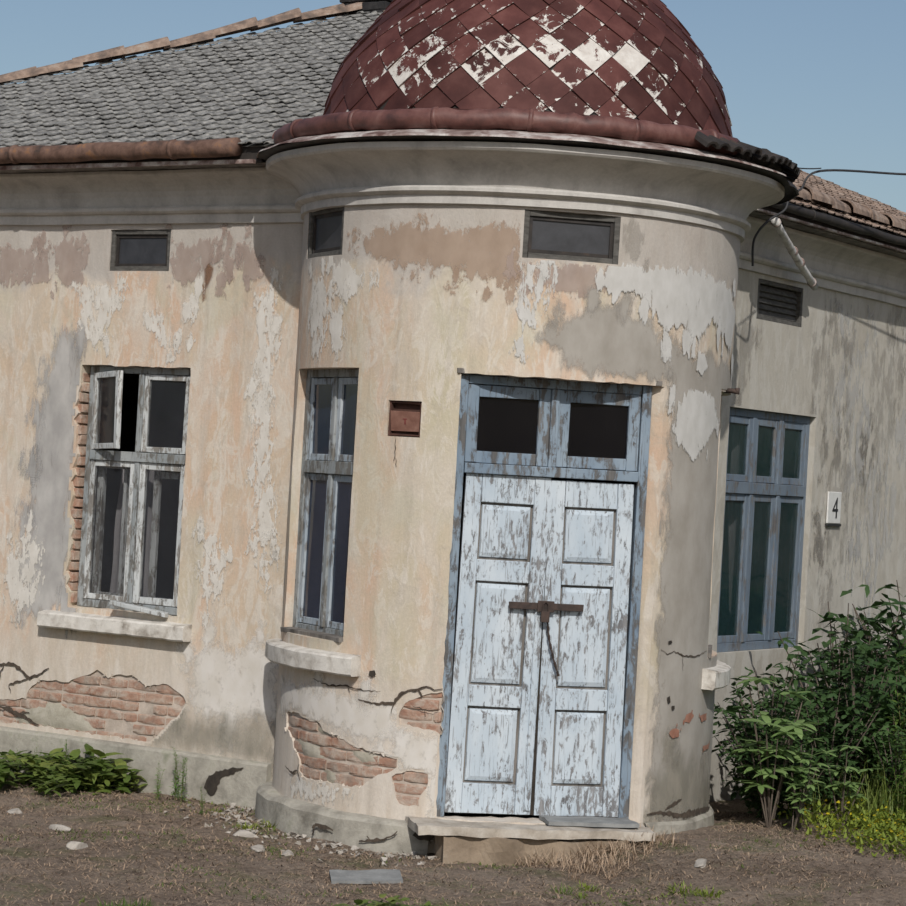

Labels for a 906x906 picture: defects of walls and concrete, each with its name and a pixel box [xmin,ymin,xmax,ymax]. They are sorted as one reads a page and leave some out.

flaking render [0,225,128,628]
peeling [143,223,283,599]
peeling [191,516,233,629]
peeling [307,213,736,822]
crack [0,662,49,725]
flaking render [0,670,186,742]
flaking render [285,712,428,806]
crack [313,678,442,717]